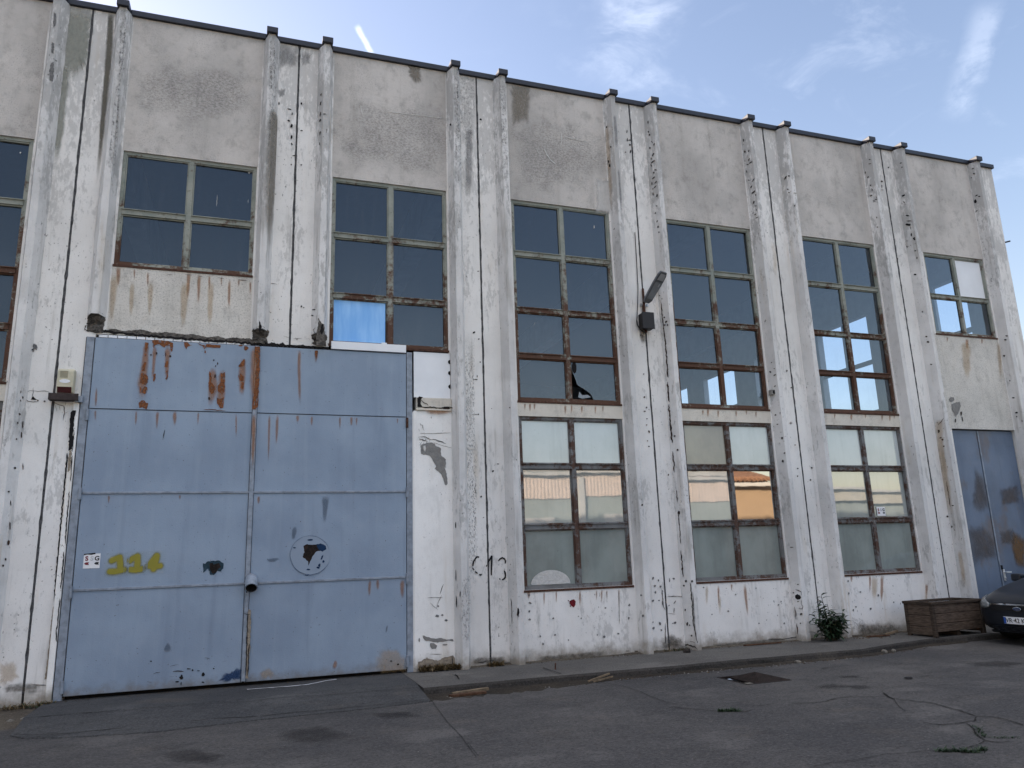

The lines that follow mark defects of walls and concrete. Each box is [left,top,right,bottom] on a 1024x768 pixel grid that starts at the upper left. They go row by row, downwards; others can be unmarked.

leakage [512,88,528,120]
leakage [266,112,278,224]
spalling [84,305,329,350]
corrosion [135,340,225,421]
corrosion [238,345,260,452]
peeling [420,442,448,485]
peeling [203,560,224,575]